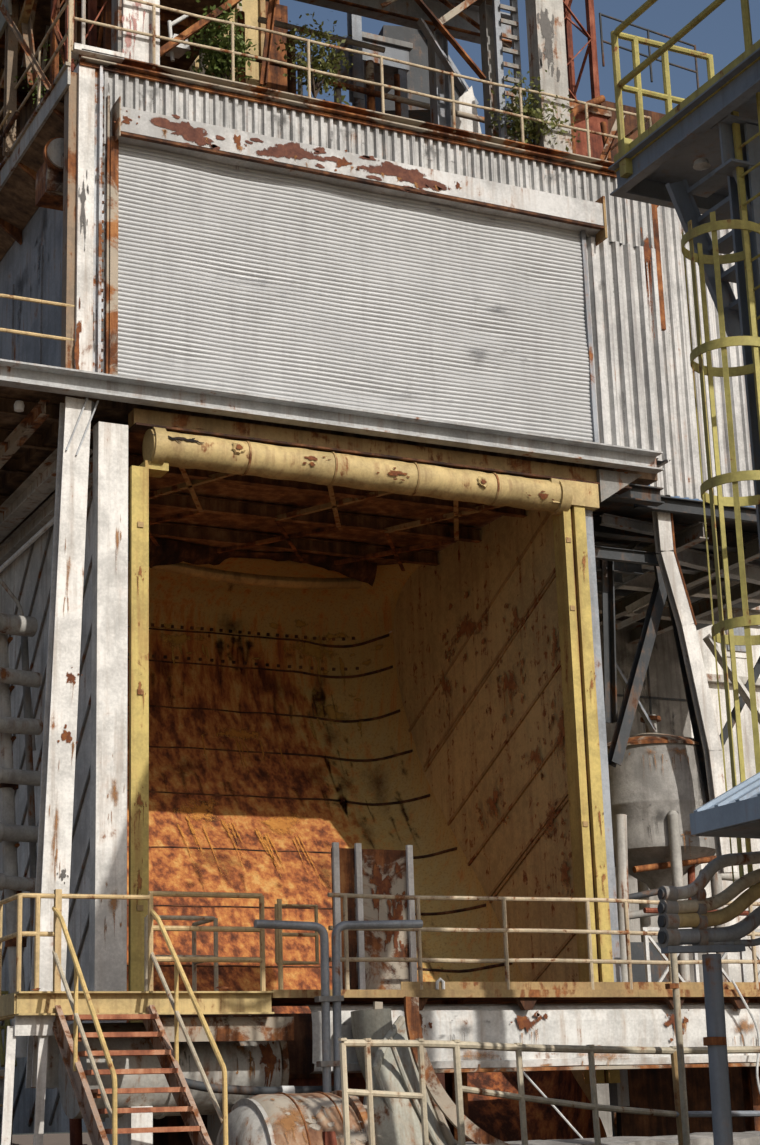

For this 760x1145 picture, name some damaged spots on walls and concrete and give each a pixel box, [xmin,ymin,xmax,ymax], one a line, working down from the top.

rust [434,592,488,727]
rust [521,699,565,780]
rust [255,805,442,990]